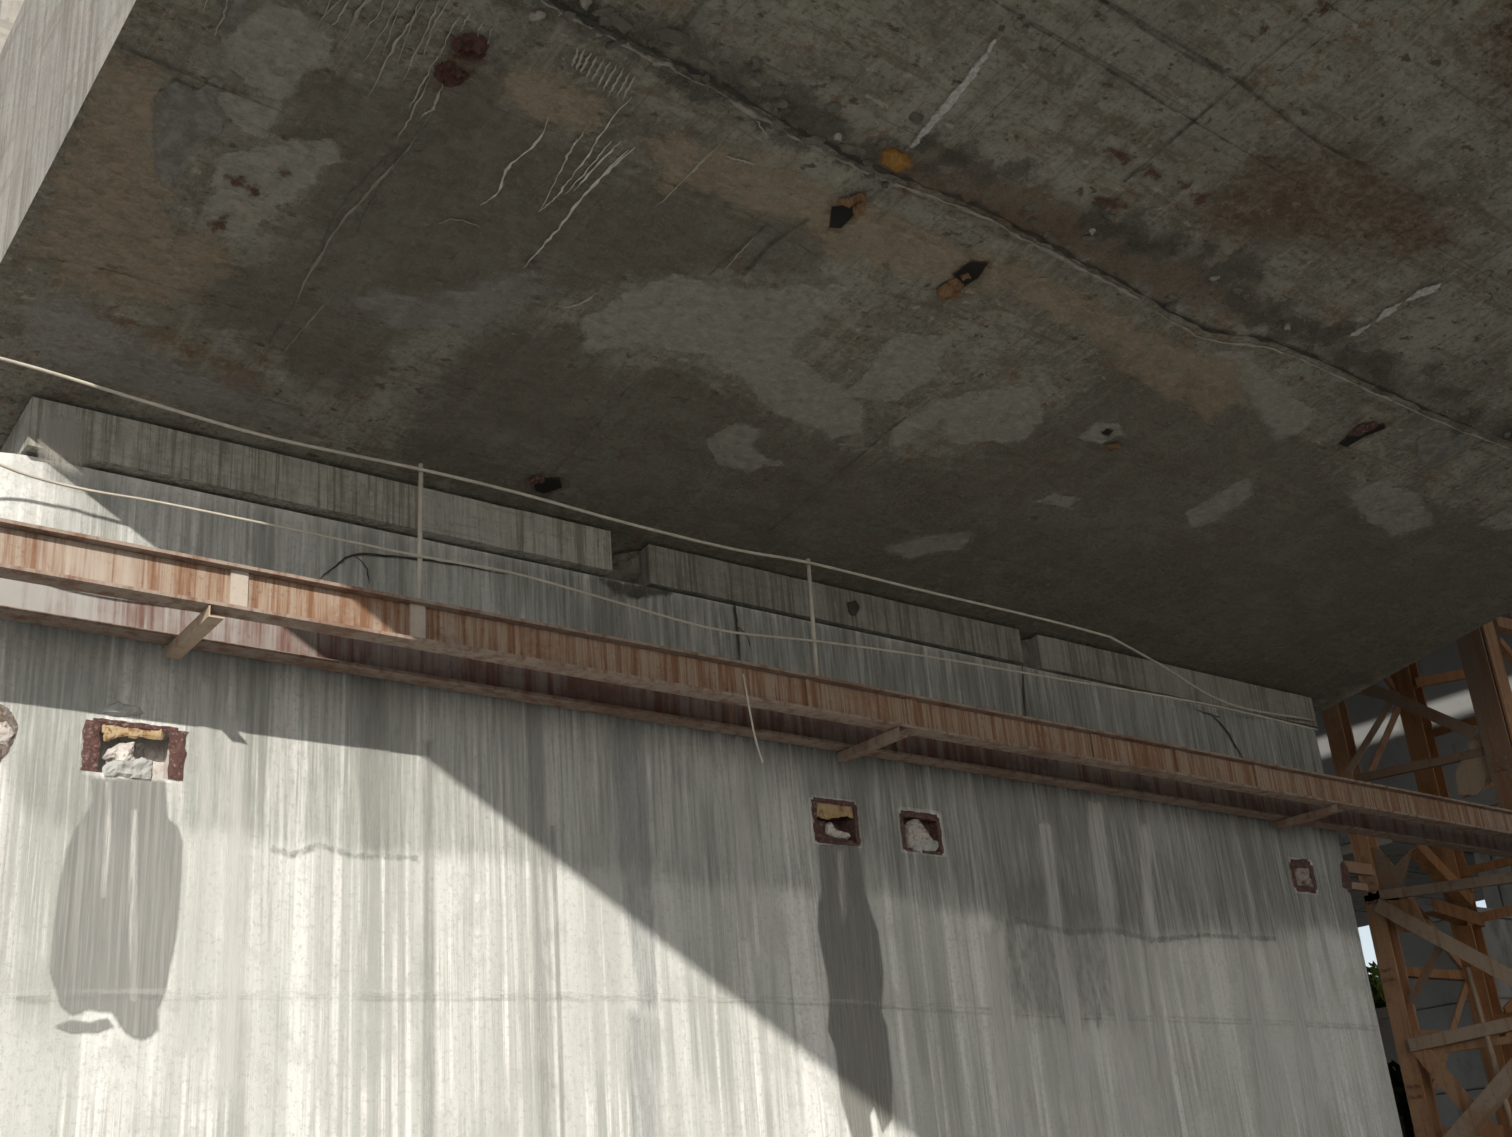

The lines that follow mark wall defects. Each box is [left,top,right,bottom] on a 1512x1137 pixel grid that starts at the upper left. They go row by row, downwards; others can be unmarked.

water stain [268,0,496,354]
corrosion [434,34,489,88]
water stain [480,118,548,206]
water stain [525,47,636,267]
spalling [829,112,931,228]
corrosion [881,148,912,172]
spalling [936,260,989,302]
crack [548,0,1512,441]
water stain [50,778,199,1039]
water stain [818,844,892,1137]